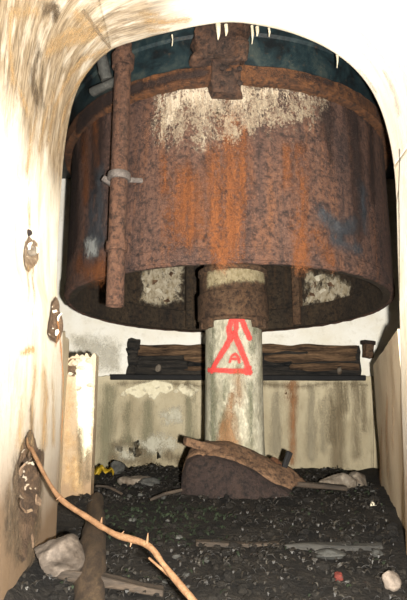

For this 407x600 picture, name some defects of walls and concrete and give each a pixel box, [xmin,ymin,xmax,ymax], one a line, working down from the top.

damp [43,4,59,21]
damp [31,9,102,131]
damp [228,85,290,122]
rust [161,110,248,269]
damp [330,109,375,254]
spalling [23,229,39,271]
spalling [47,297,63,343]
damp [100,386,194,468]
rust [182,370,306,490]
damp [265,383,299,454]
damp [307,380,374,471]
spalling [13,430,44,562]